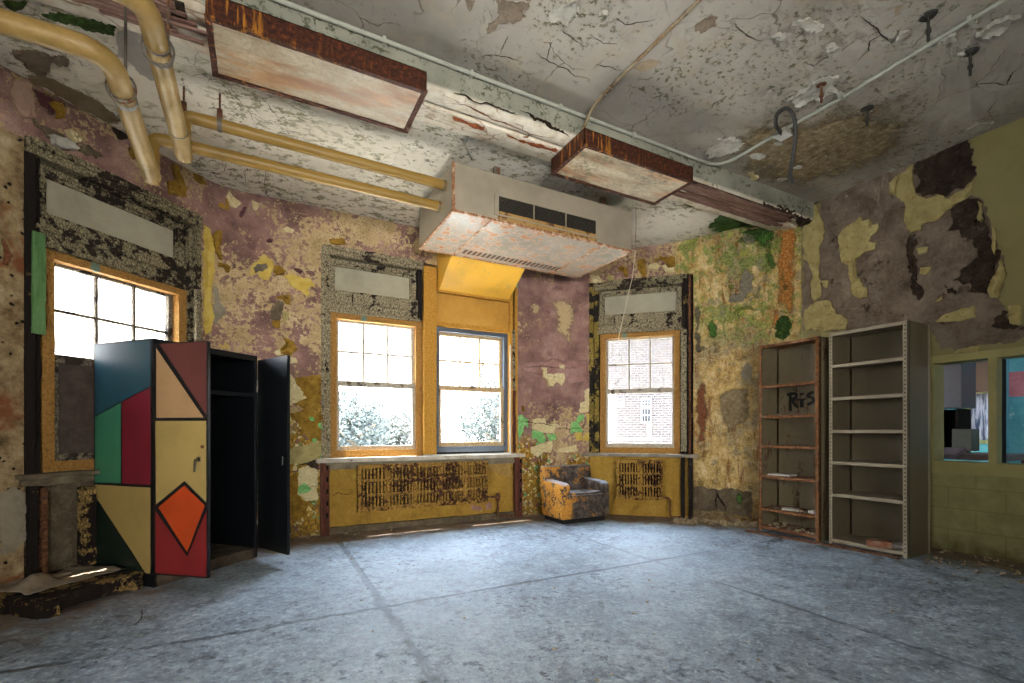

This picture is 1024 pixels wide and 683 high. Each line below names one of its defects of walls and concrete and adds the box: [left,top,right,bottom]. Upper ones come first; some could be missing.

peeling [487,0,530,34]
crack [805,16,892,66]
peeling [9,46,136,160]
corrosion [452,117,485,132]
crack [456,93,570,138]
corrosion [507,134,558,152]
peeling [786,75,839,108]
leakage [727,104,917,186]
peeling [202,225,231,335]
corrosion [768,228,796,336]
flaking render [763,140,1024,353]
peeling [518,388,589,457]